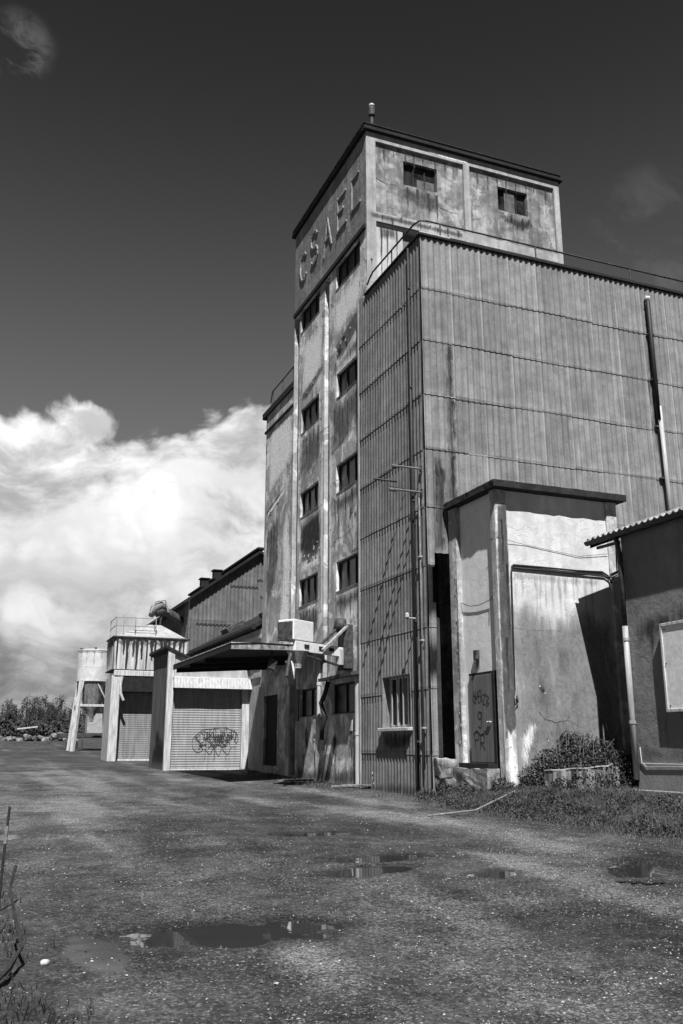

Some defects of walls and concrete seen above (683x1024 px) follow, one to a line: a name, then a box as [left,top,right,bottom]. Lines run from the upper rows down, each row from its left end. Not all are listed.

damp [373,187,462,269]
damp [505,217,532,229]
damp [435,351,456,547]
damp [301,513,320,551]